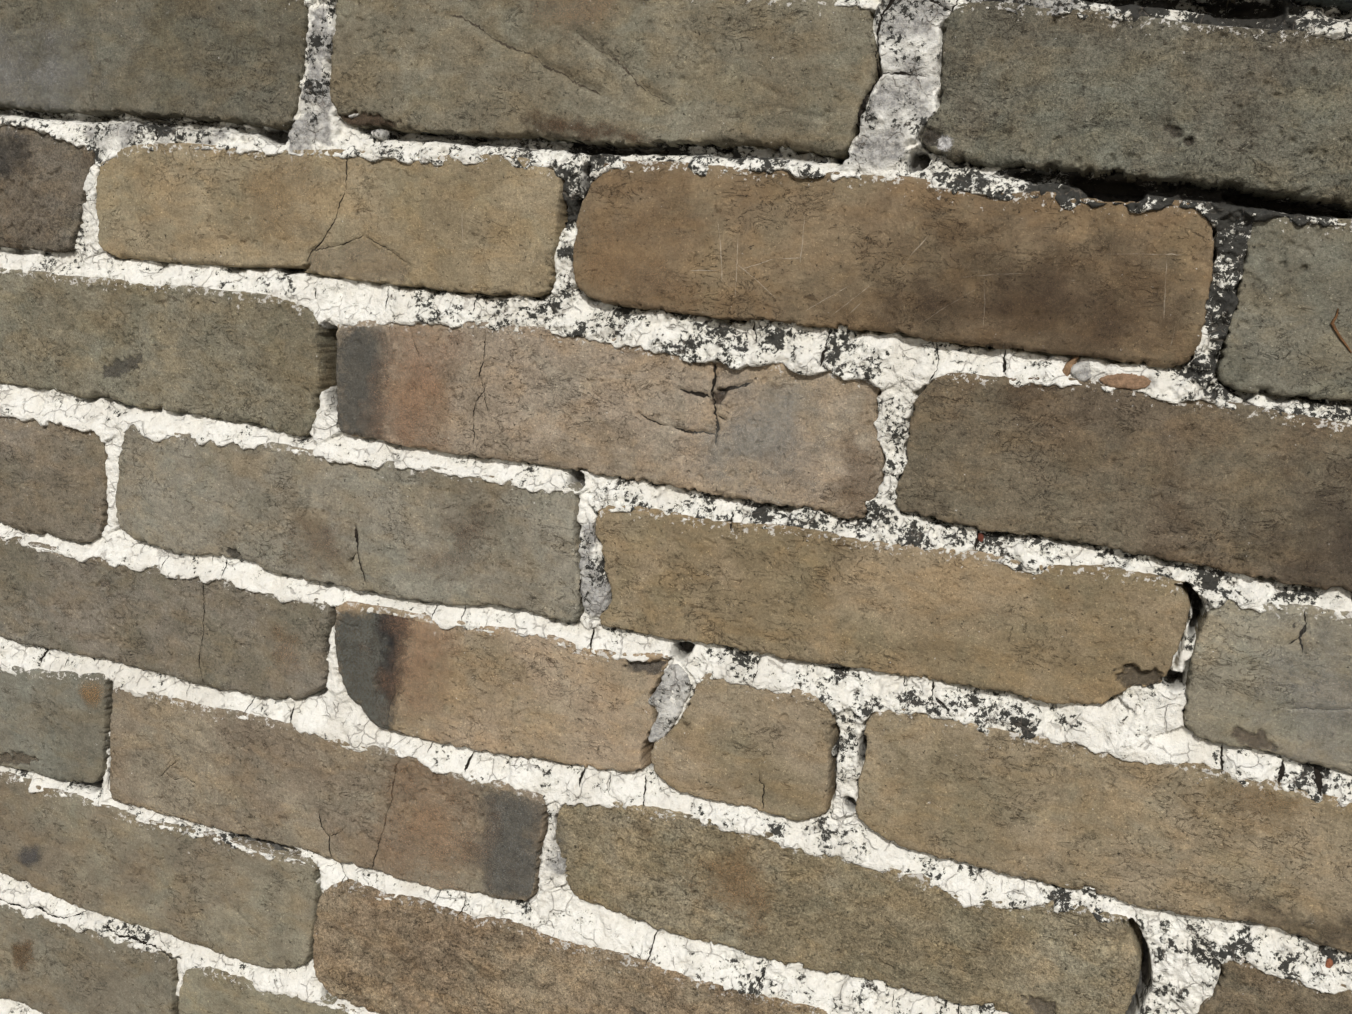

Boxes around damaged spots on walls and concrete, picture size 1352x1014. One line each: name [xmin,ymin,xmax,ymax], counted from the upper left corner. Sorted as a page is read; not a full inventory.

crack [307,158,410,309]
crack [640,364,752,445]
crack [186,554,227,696]
crack [319,742,433,886]